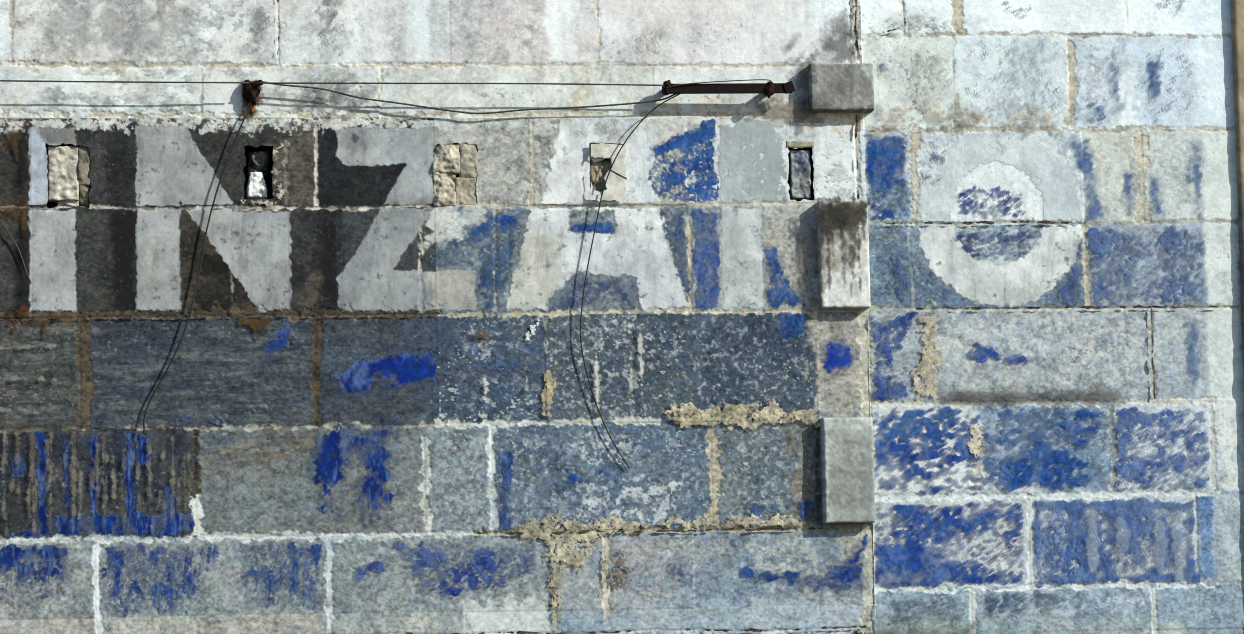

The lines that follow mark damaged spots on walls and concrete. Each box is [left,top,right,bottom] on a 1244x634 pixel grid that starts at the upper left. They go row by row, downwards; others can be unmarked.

rust [242,80,264,121]
water stain [815,196,871,291]
peeling [331,351,451,393]
peeling [739,240,1211,624]
peeling [0,412,219,618]